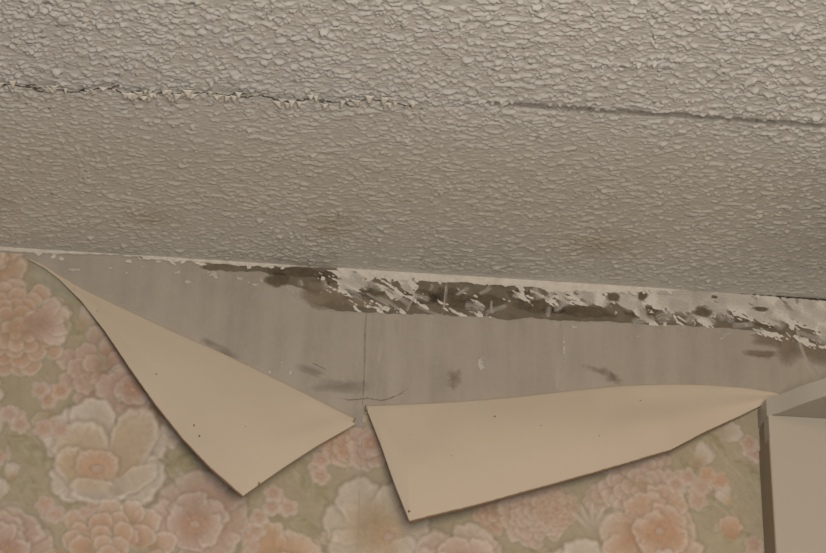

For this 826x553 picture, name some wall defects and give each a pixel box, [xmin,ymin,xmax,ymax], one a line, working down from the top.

crack [0,79,427,110]
spalling [0,247,826,349]